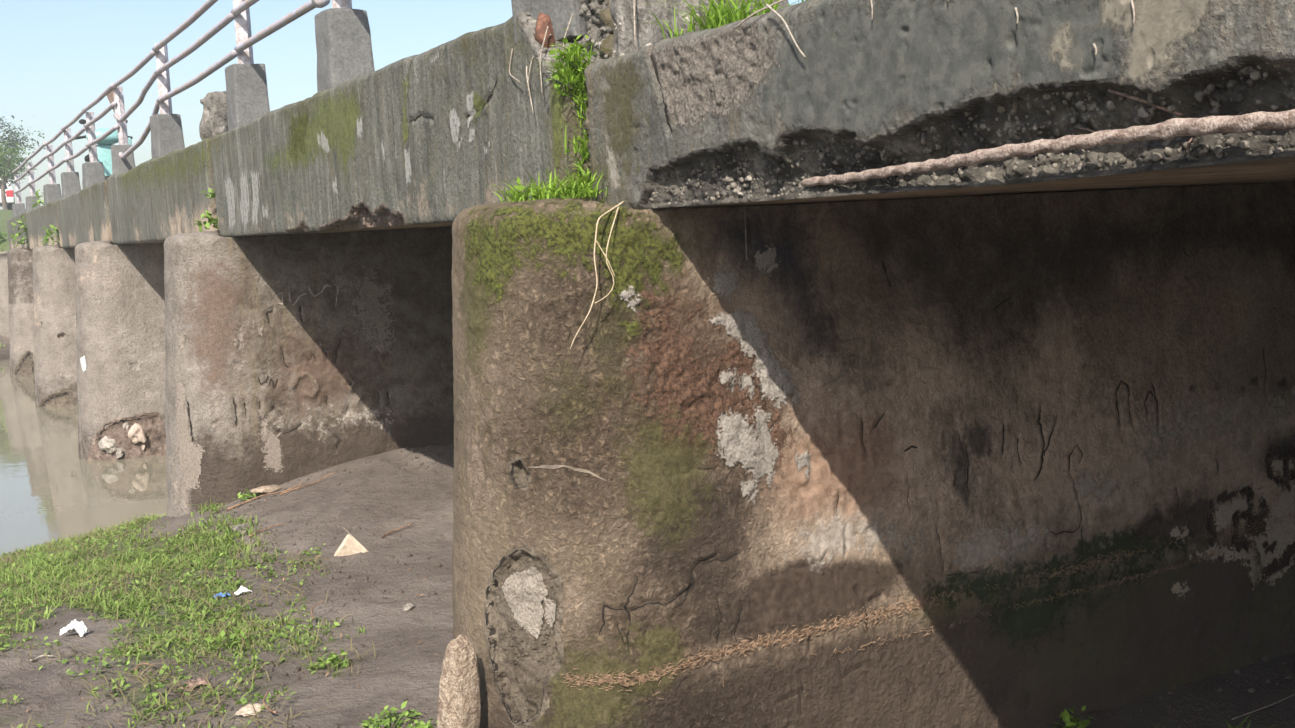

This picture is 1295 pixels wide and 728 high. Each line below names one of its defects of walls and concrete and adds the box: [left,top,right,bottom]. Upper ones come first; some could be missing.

spalling [637,0,1295,209]
flaking render [619,285,642,312]
flaking render [754,244,781,277]
water stain [719,216,834,351]
spalling [87,380,205,493]
flaking render [255,407,285,475]
flaking render [709,266,801,505]
spalling [437,545,567,728]
crack [599,553,743,655]
water stain [743,512,916,640]
water stain [1125,498,1215,553]
flaking render [1170,443,1295,591]